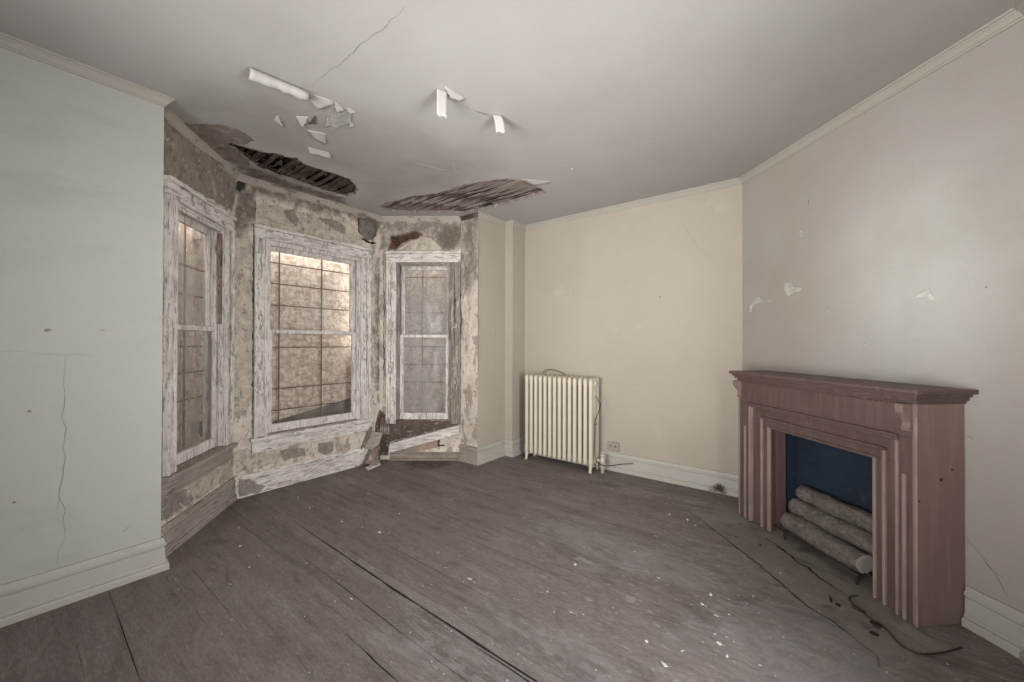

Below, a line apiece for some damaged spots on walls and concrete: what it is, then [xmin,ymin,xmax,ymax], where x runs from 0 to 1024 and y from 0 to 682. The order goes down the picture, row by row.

crack [316,7,404,81]
peeling [248,67,357,159]
peeling [437,87,465,119]
peeling [477,111,505,133]